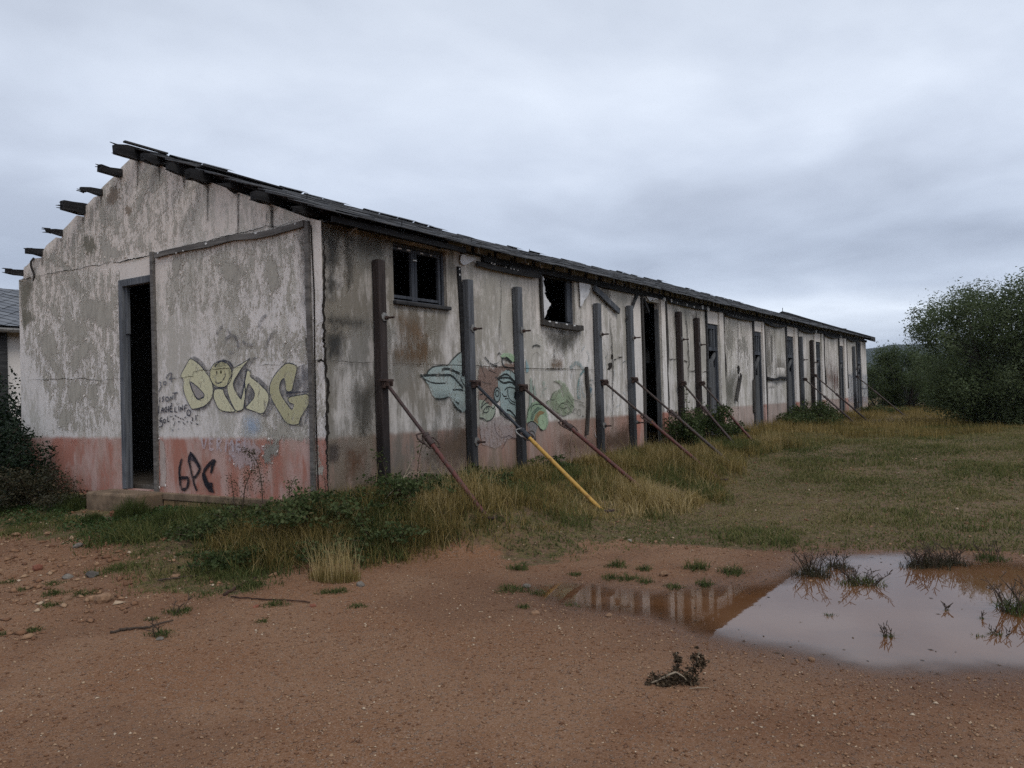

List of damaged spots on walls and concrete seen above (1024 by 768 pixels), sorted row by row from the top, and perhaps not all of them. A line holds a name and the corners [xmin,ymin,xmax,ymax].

peeling [19,168,325,475]
leakage [326,225,353,291]
crack [313,220,584,492]